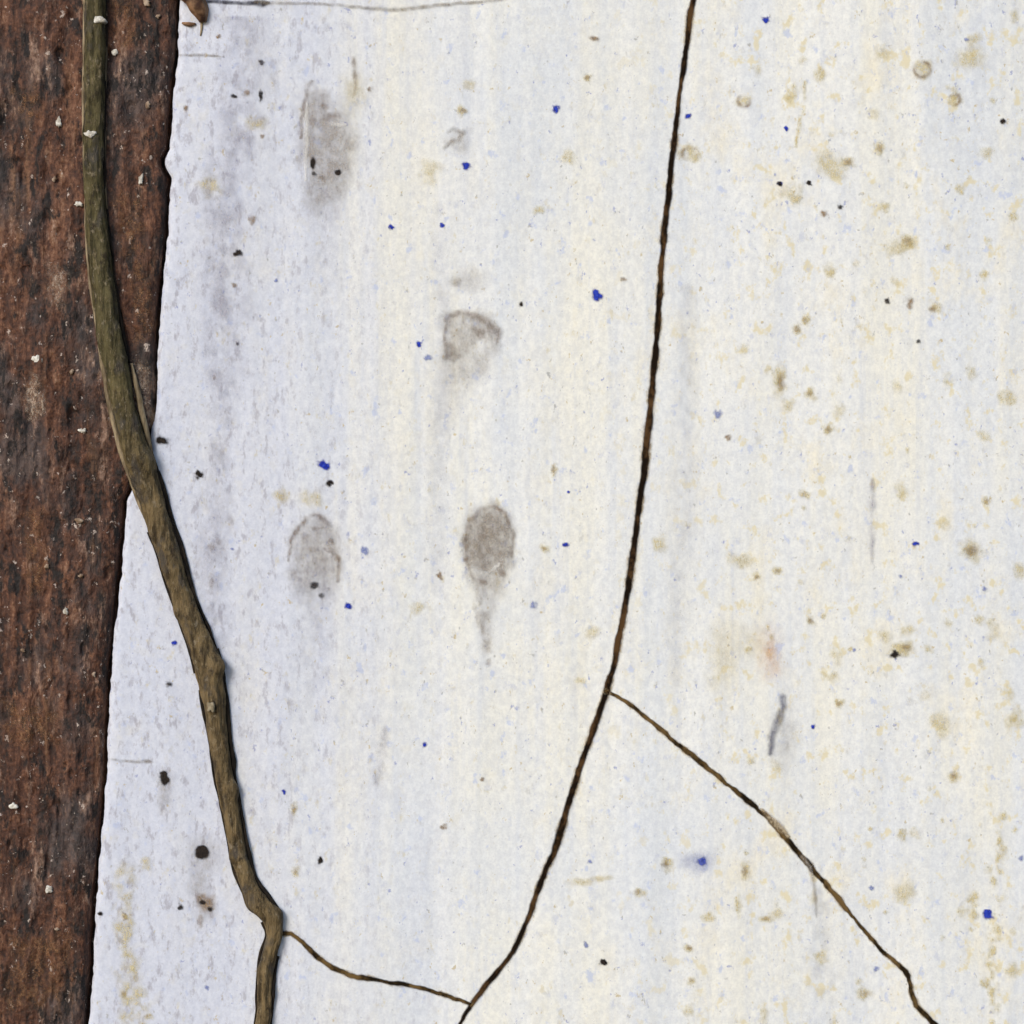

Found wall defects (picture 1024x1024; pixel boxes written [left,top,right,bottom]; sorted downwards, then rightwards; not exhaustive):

crack [207,0,270,8]
water stain [305,103,347,184]
crack [283,0,938,1024]